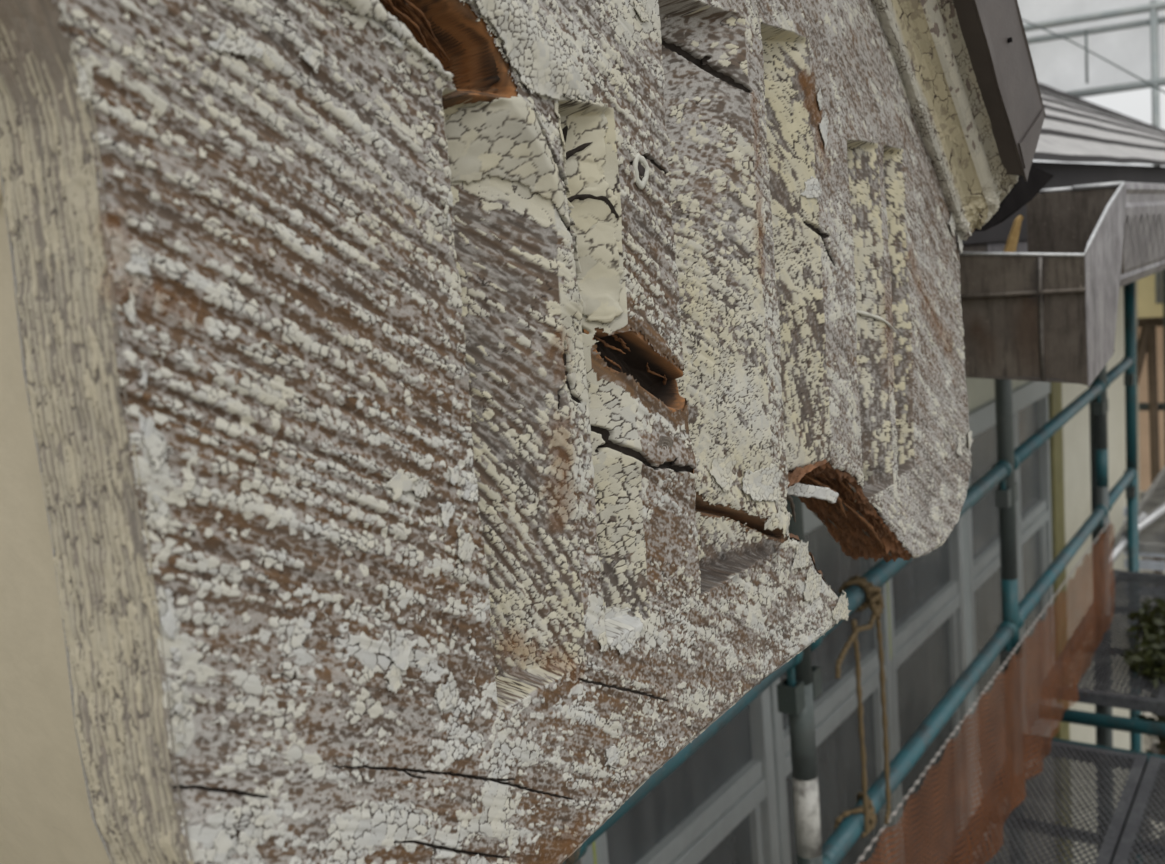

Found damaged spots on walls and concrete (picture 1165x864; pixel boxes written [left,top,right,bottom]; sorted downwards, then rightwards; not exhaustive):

crack [661,39,751,93]
peeling [337,0,623,323]
crack [557,329,693,472]
peeling [384,465,479,563]
spalling [695,454,913,624]
peeling [598,606,643,655]
peeling [384,629,418,694]
peeling [435,672,459,715]
crack [579,678,668,702]
crack [172,785,268,798]
crack [395,840,509,864]
peeling [467,854,489,864]